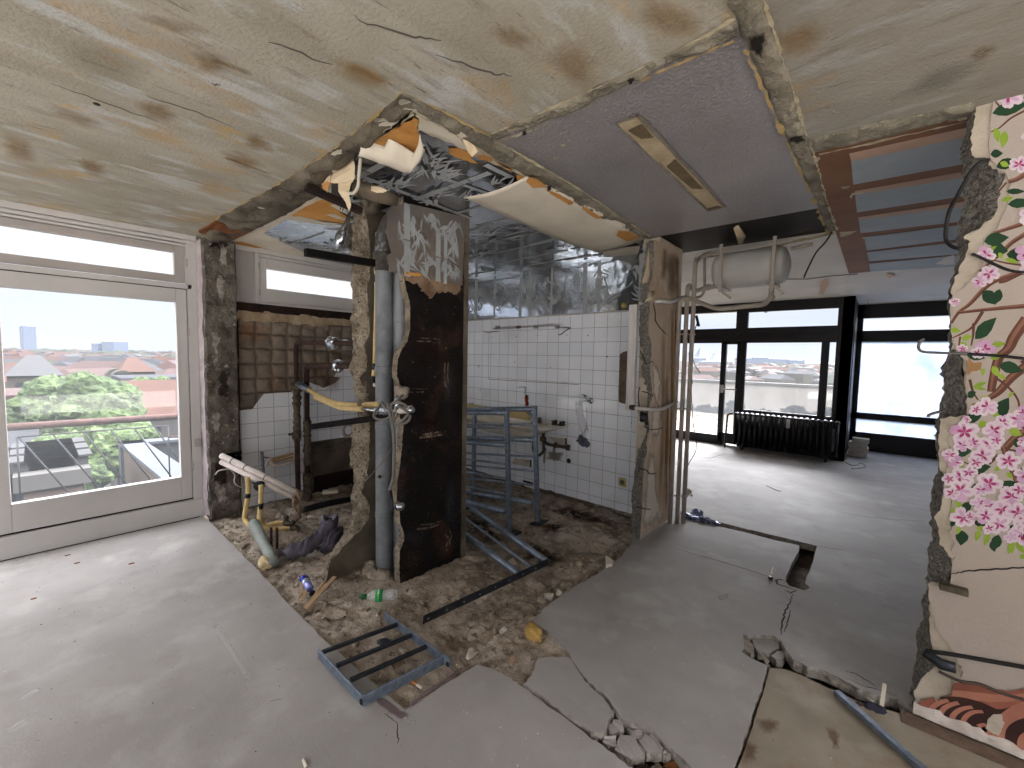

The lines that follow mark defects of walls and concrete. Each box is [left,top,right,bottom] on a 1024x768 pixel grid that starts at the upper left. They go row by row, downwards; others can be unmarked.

peeling [743,34,856,237]
spalling [215,242,228,298]
flaking render [404,271,461,299]
peeling [236,205,371,583]
spalling [631,241,663,539]
spalling [909,107,1005,707]
crack [669,546,797,634]